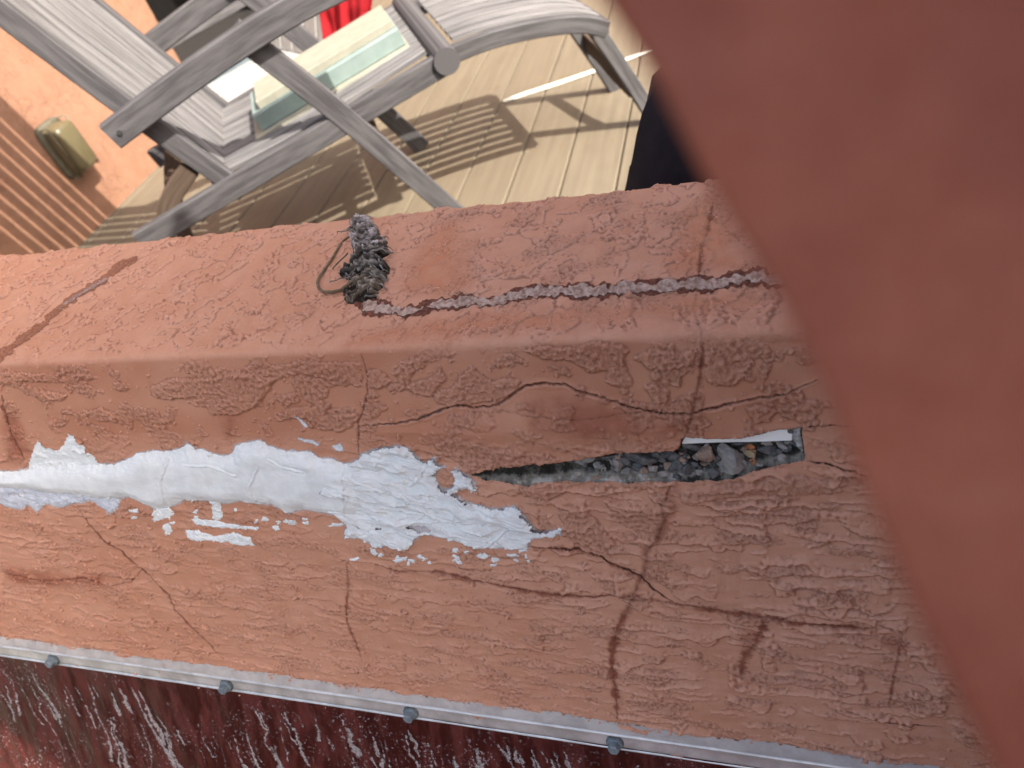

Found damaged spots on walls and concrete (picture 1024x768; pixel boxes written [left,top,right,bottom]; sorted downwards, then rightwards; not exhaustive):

crack [354,258,772,320]
spalling [472,427,805,501]
crack [550,547,666,598]
crack [609,615,625,710]